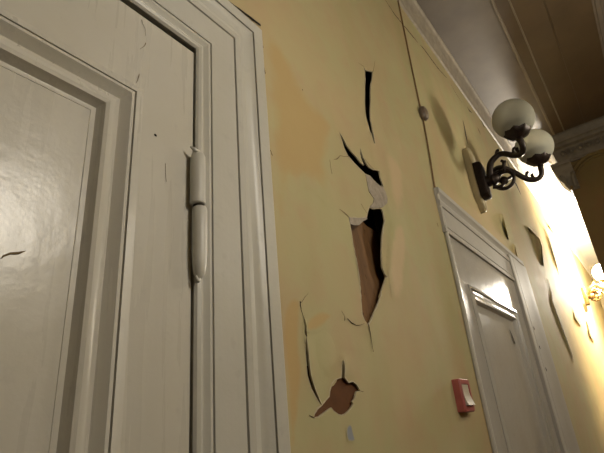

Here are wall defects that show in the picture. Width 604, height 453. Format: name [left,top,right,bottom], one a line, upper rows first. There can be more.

flaking render [334,132,388,352]
crack [300,296,322,406]
spalling [307,360,363,418]